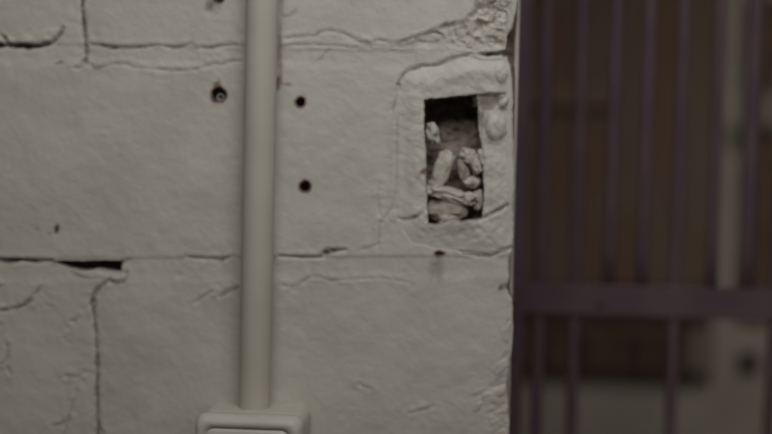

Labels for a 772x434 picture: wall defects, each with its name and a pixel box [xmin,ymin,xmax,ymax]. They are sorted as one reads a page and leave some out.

crack [0,40,56,49]
spalling [356,0,514,52]
spalling [421,94,502,224]
crack [2,256,38,264]